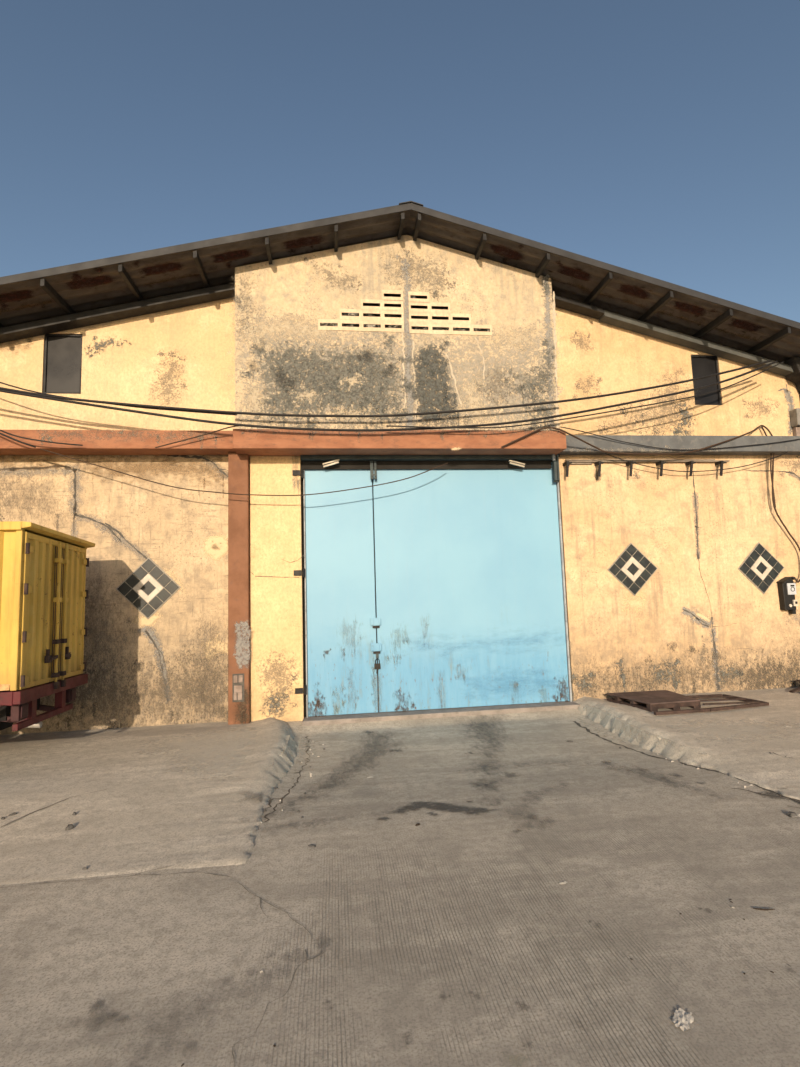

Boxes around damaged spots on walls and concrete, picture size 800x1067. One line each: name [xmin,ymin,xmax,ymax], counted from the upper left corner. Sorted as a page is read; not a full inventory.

corrosion [548,261,590,289]
corrosion [617,285,650,299]
damp [242,335,459,429]
damp [505,339,556,430]
crack [682,473,757,690]
damp [46,591,257,778]
damp [263,693,289,717]
damp [572,644,800,744]